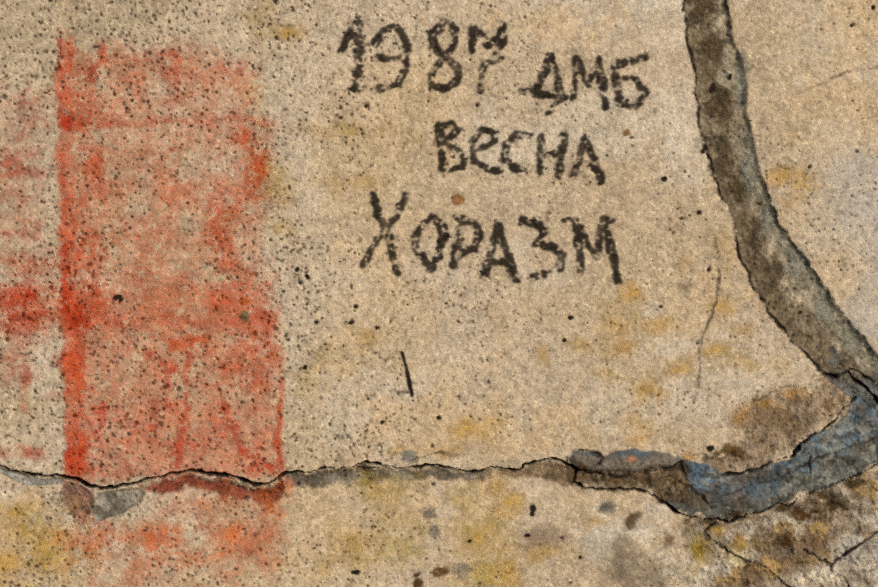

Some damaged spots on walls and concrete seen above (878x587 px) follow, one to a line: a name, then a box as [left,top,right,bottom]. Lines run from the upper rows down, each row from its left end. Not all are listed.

crack [4,466,303,490]
crack [319,0,878,587]